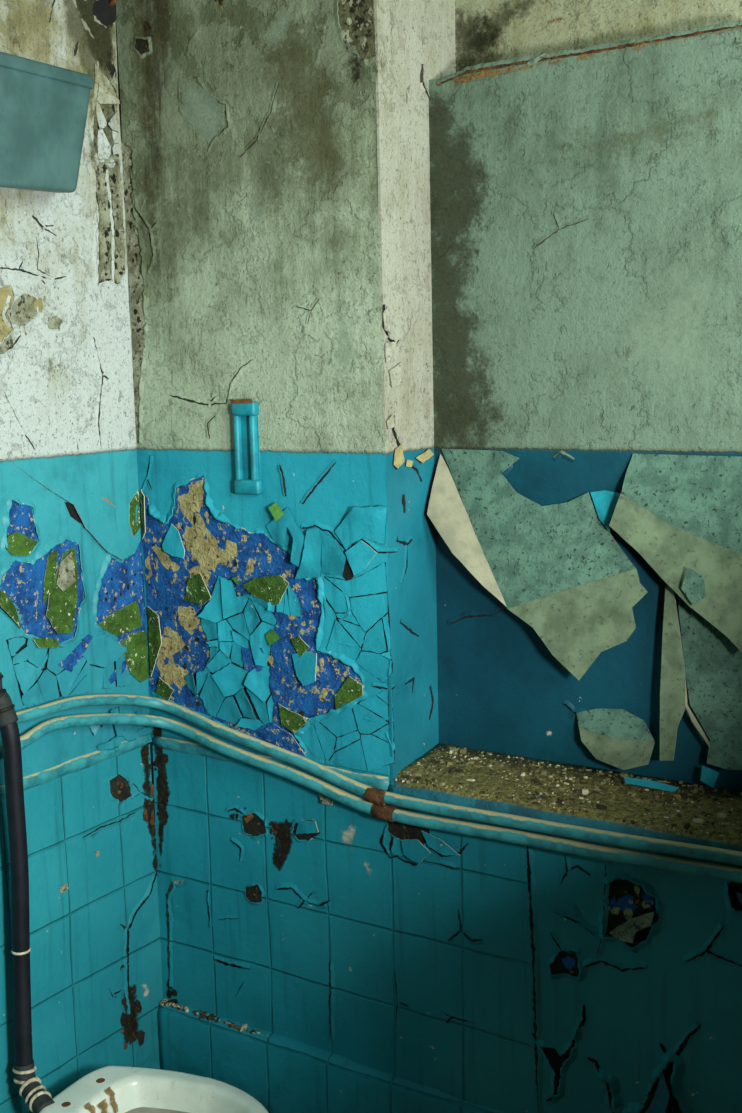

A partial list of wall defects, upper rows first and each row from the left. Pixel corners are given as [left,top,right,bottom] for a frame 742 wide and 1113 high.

leakage [145,0,169,202]
leakage [429,98,501,451]
peeling [0,0,398,773]
flaking render [226,804,269,861]
peeling [290,818,321,843]
flaking render [244,883,266,906]
peeling [547,871,663,982]
peeling [530,1004,700,1113]